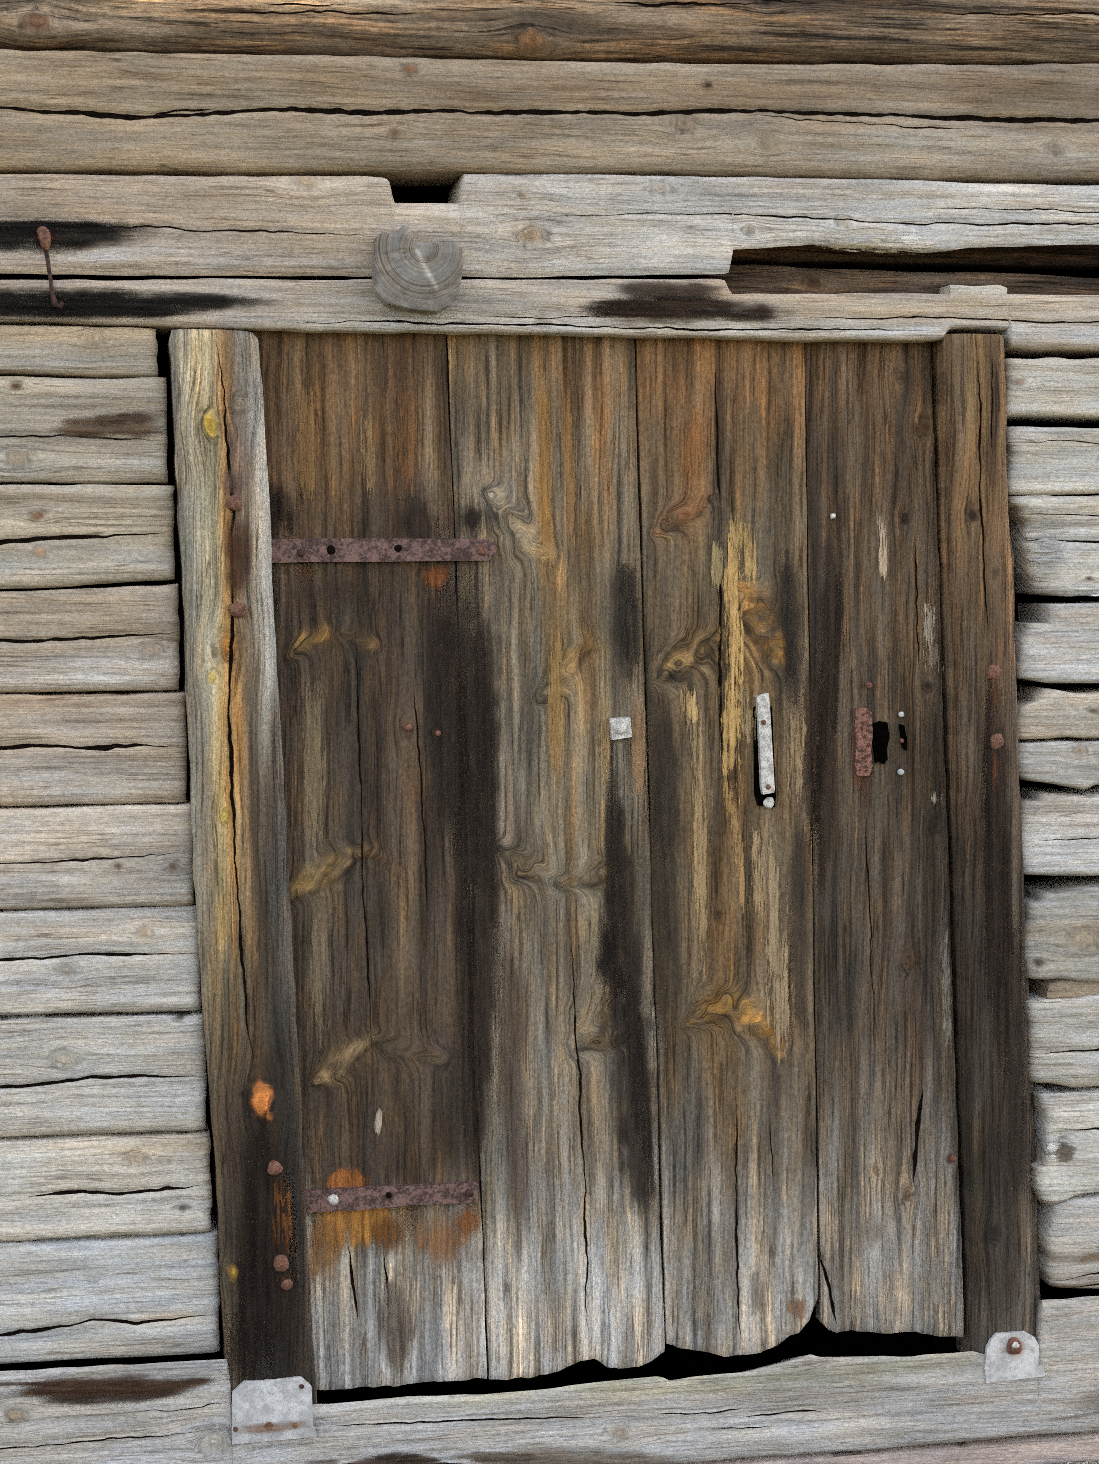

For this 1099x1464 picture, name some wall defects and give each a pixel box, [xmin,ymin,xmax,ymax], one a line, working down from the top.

crack [0,106,1099,130]
crack [216,345,236,533]
crack [0,632,174,643]
crack [0,743,186,751]
crack [227,588,254,1067]
crack [0,851,190,864]
crack [0,952,198,961]
crack [913,1090,923,1182]
corrosion [327,1170,364,1188]
corrosion [272,1184,292,1253]
corrosion [311,1208,479,1273]